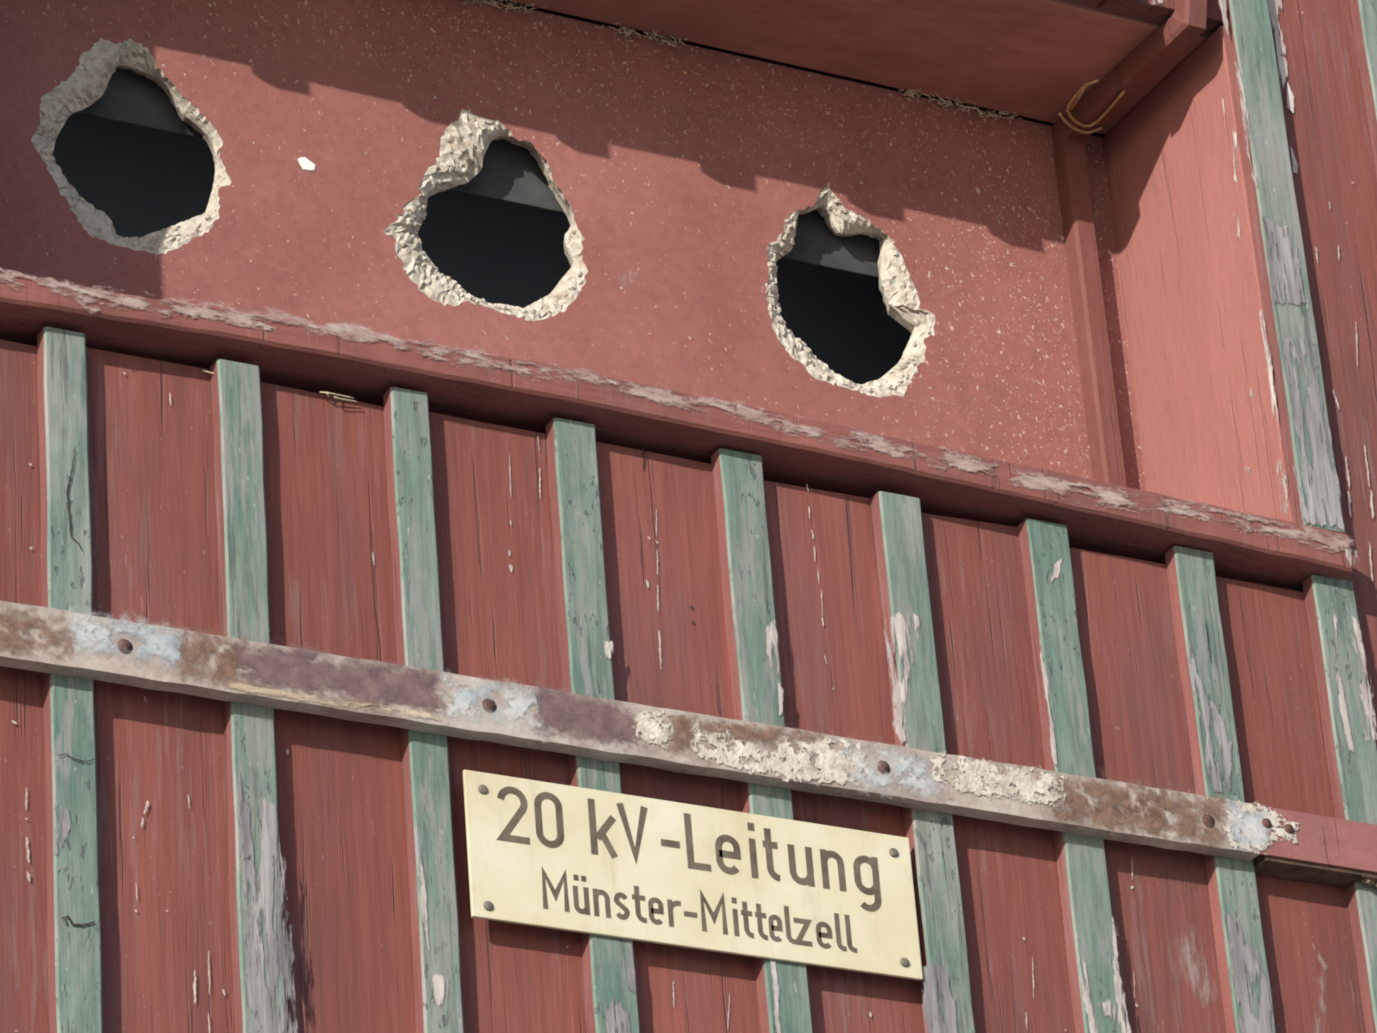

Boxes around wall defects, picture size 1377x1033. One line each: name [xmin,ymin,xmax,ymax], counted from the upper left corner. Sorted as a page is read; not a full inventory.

spalling [31,38,231,255]
spalling [383,109,588,321]
peeling [0,268,998,475]
spalling [765,184,935,398]
peeling [1011,215,1357,565]
corrosion [0,611,73,657]
peeling [237,771,298,1033]
corrosion [178,629,446,711]
corrosion [536,683,639,742]
corrosion [669,715,814,750]
peeling [884,612,921,743]
corrosion [1056,779,1224,846]